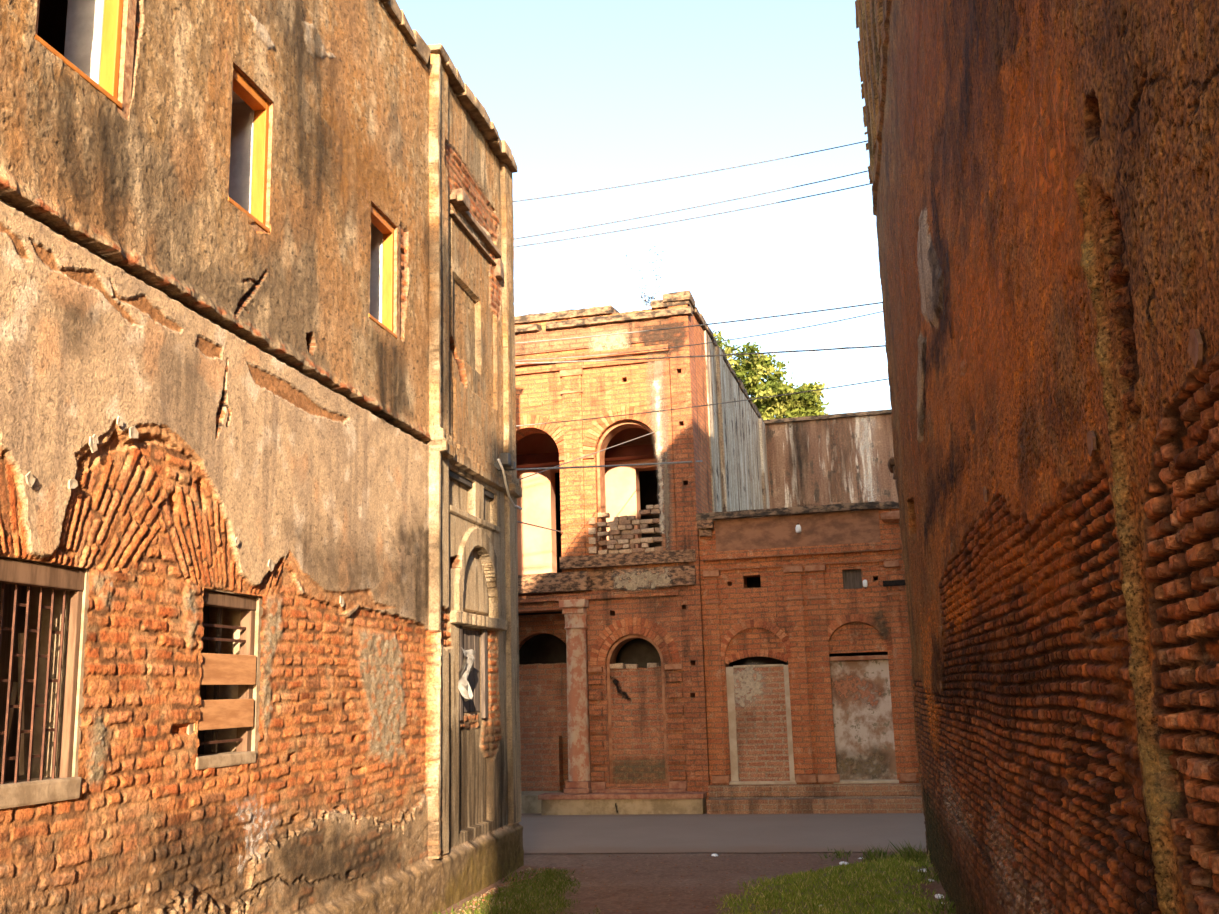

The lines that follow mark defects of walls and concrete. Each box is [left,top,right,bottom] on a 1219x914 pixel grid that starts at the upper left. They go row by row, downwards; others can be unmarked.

flaking render [0,219,224,362]
crack [234,268,269,318]
leakage [428,232,450,383]
leakage [918,174,951,433]
flaking render [246,360,350,426]
leakage [373,343,400,422]
leakage [790,422,807,490]
flaking render [0,416,454,914]
flaking render [912,431,1162,914]
flaking render [1142,329,1219,914]
leakage [836,748,888,779]
leakage [287,838,386,888]